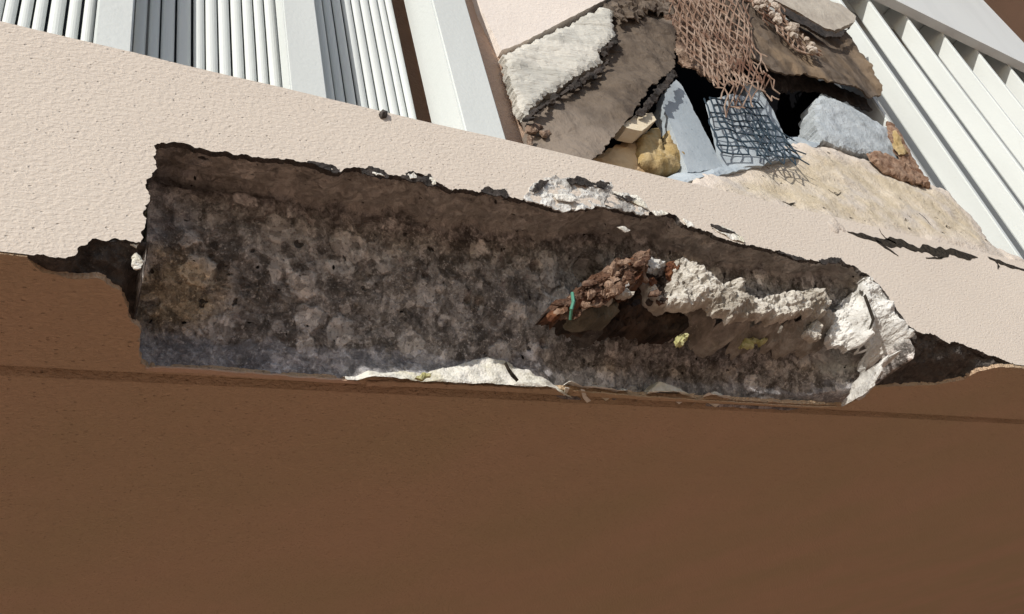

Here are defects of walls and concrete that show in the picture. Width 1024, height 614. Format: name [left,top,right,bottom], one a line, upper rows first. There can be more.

flaking render [498,0,683,160]
flaking render [720,0,883,112]
spalling [33,147,1008,410]
crack [847,213,1024,271]